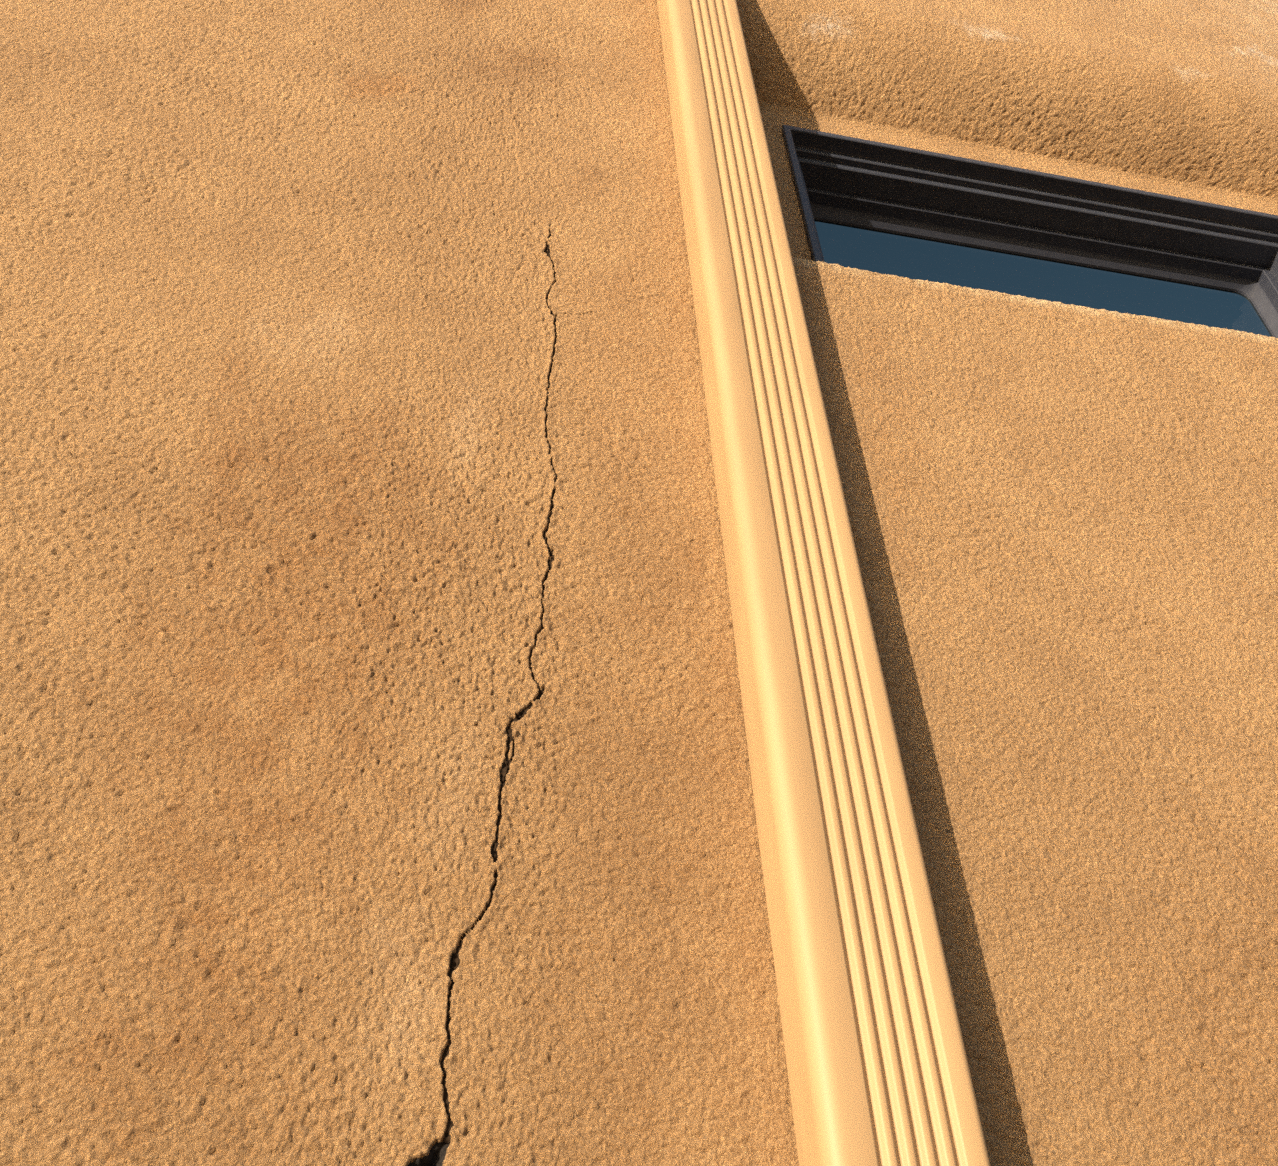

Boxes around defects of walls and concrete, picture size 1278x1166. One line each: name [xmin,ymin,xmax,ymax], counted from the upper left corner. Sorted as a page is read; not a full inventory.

crack [408,231,558,1166]